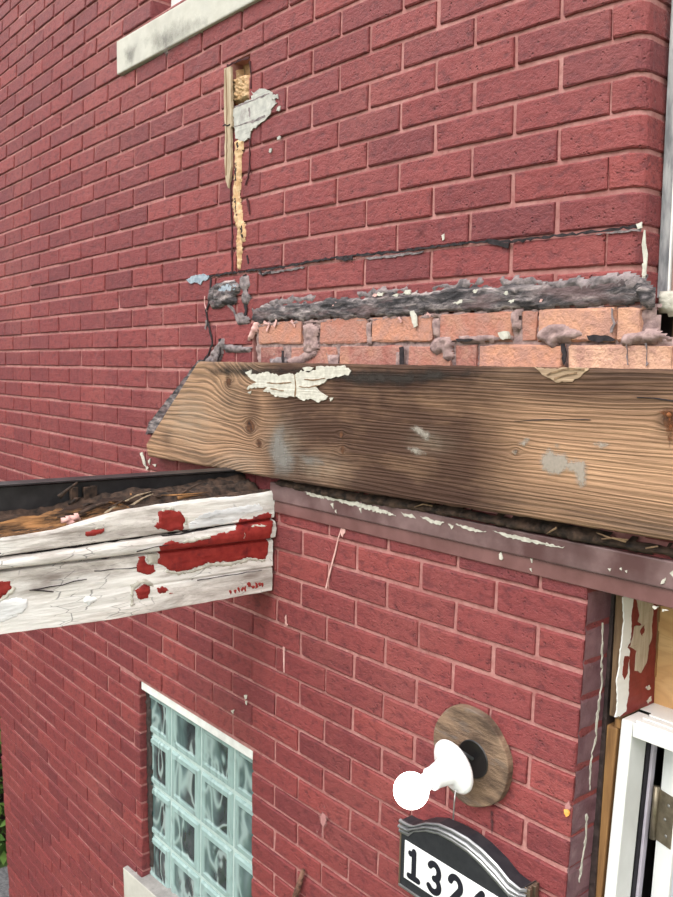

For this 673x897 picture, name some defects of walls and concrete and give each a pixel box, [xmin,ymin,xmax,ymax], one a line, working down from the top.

spalling [233,88,281,142]
crack [203,56,643,361]
spalling [245,230,673,403]
peeling [0,581,28,622]
peeling [85,527,106,537]
peeling [130,503,273,606]
peeling [306,492,564,548]
peeling [614,597,668,717]